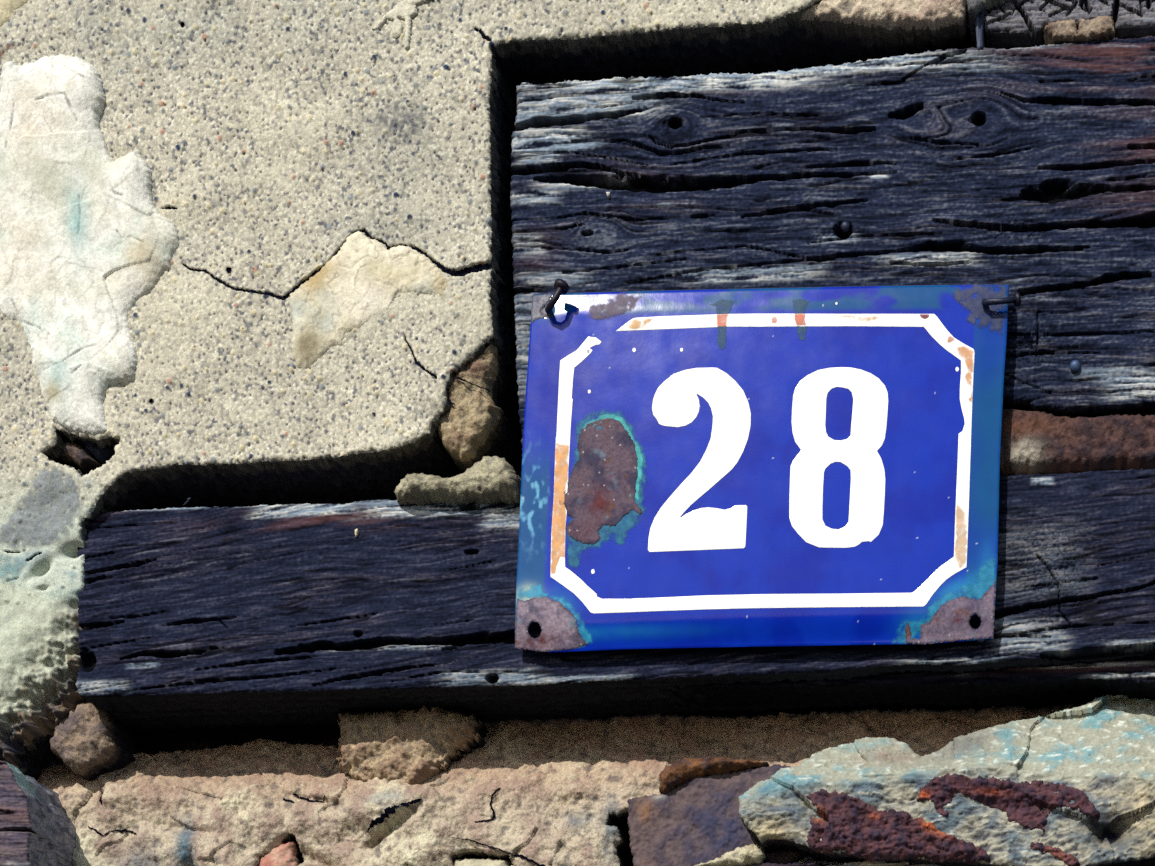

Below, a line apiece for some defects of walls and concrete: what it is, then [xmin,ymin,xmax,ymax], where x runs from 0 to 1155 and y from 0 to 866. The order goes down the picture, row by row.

crack [182,229,492,300]
rust [806,773,1100,866]